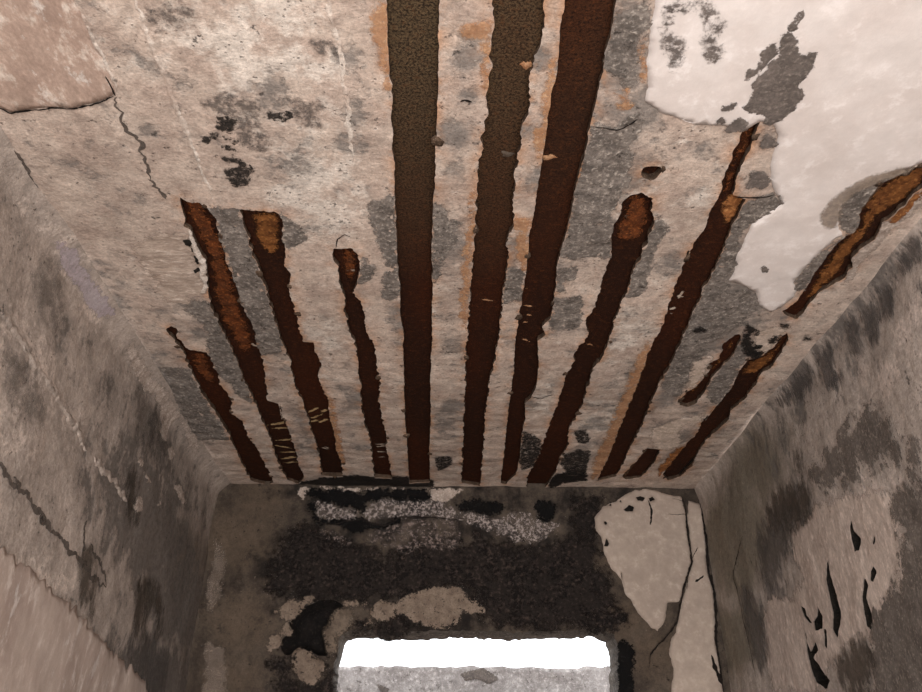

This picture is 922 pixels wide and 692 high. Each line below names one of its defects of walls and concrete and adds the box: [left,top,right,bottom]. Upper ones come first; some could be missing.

crack [0,76,167,199]
corrosion [533,58,556,158]
corrosion [457,191,478,331]
corrosion [513,218,532,271]
peeling [524,0,922,487]
corrosion [591,342,650,480]
crack [0,462,107,588]
leakage [298,486,379,500]
leakage [323,608,356,655]
leakage [315,487,559,552]
crack [648,499,756,692]
peeling [763,399,922,692]